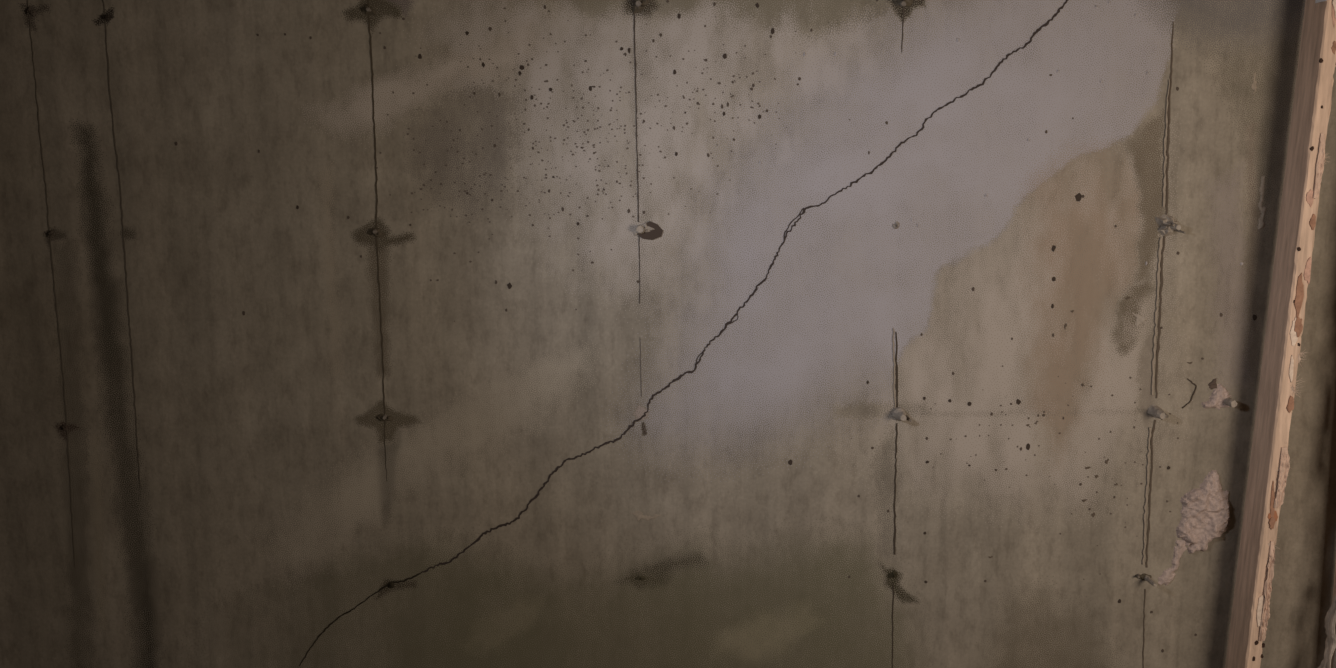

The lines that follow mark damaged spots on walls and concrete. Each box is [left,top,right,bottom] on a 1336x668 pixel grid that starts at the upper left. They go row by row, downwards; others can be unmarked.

crack [300,0,1068,665]